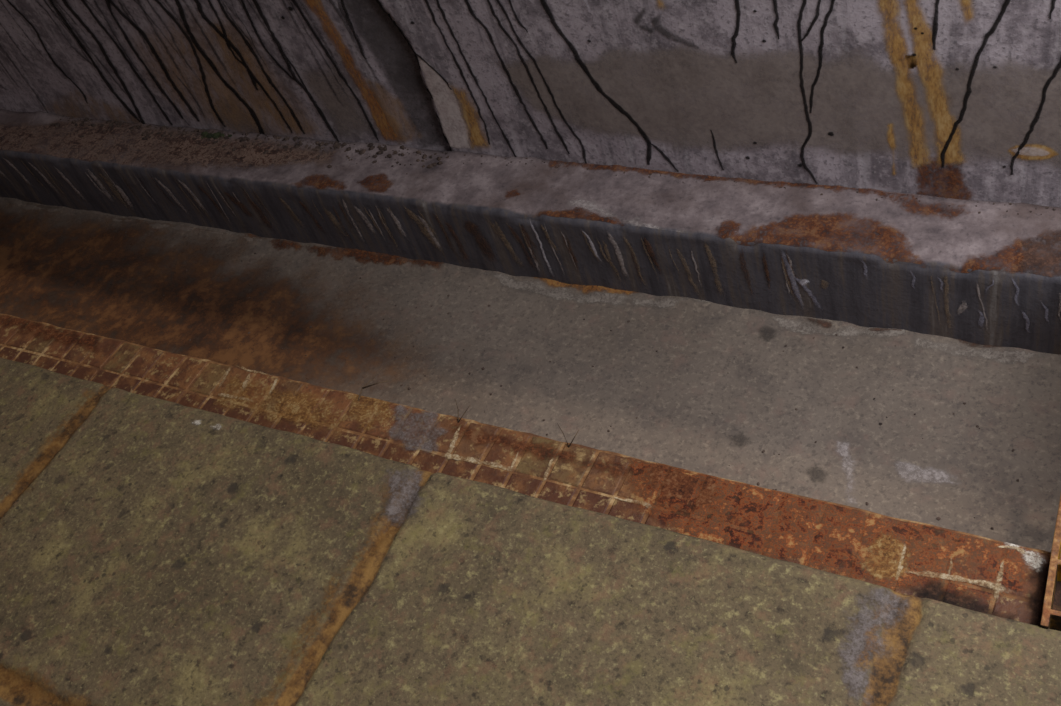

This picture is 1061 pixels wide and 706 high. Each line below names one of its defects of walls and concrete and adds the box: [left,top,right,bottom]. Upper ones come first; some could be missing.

corrosion [306,0,411,140]
crack [376,0,452,150]
corrosion [549,0,972,217]
corrosion [0,212,379,425]
corrosion [272,239,441,267]
corrosion [359,174,391,192]
corrosion [542,278,633,294]
corrosion [717,214,925,268]
corrosion [952,231,1061,277]
corrosion [453,425,1027,601]